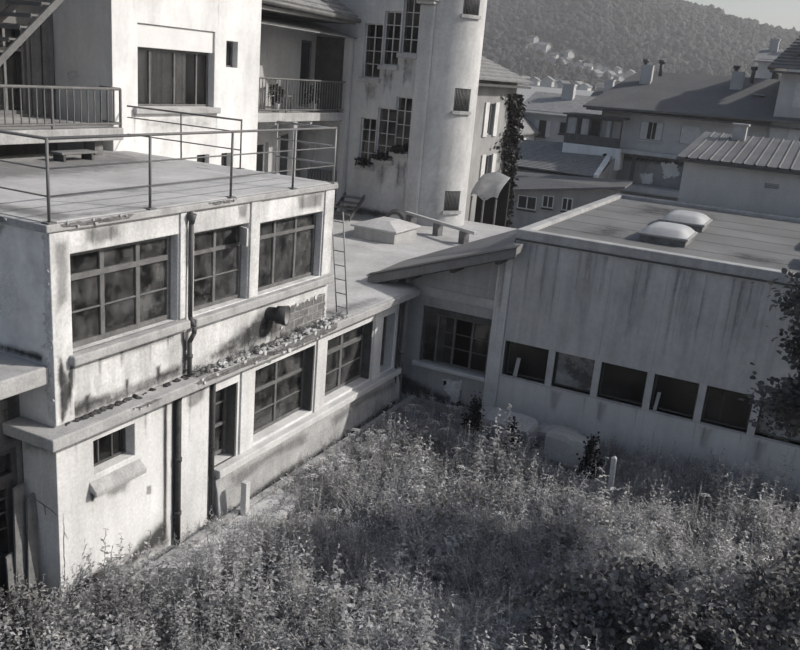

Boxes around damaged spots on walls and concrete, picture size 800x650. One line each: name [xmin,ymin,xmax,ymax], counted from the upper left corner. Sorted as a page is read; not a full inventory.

flaking render [640,162,681,184]
water stain [59,331,188,420]